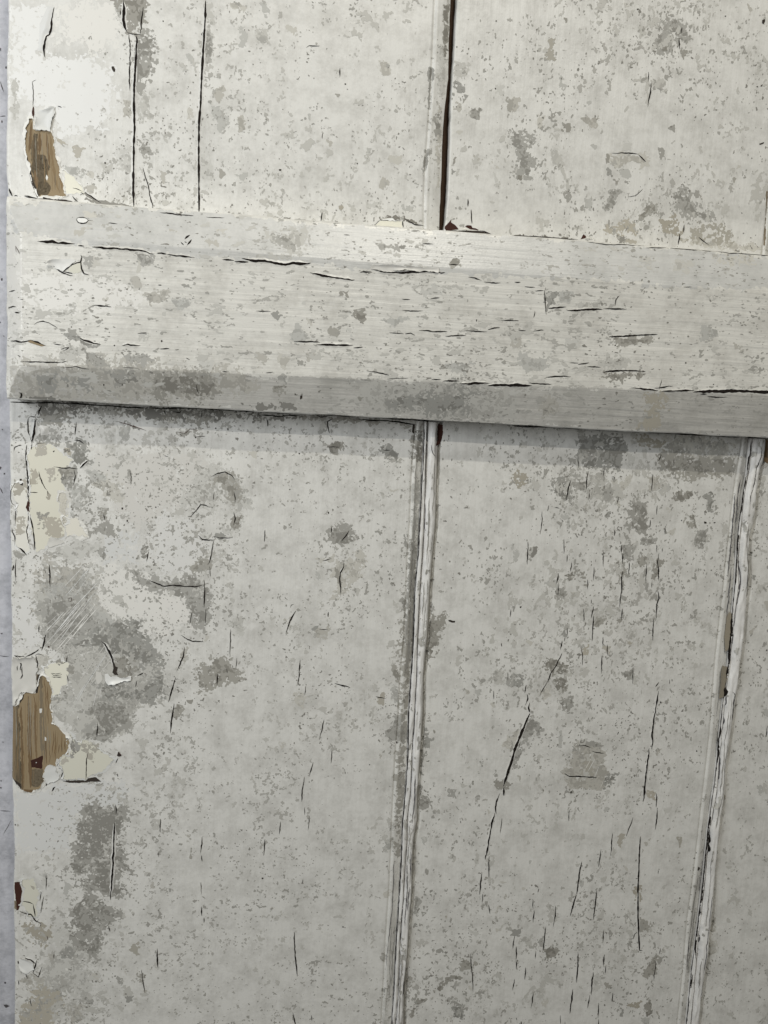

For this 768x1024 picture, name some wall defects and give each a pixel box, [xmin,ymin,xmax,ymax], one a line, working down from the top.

peeling [22,106,85,202]
crack [39,0,221,276]
crack [9,290,190,369]
crack [222,258,623,337]
crack [434,362,768,398]
peeling [0,419,90,554]
crack [147,472,236,733]
peeling [0,646,121,795]
peeling [105,658,131,685]
crack [479,456,666,912]
peeling [14,878,41,917]
crack [513,681,670,1024]